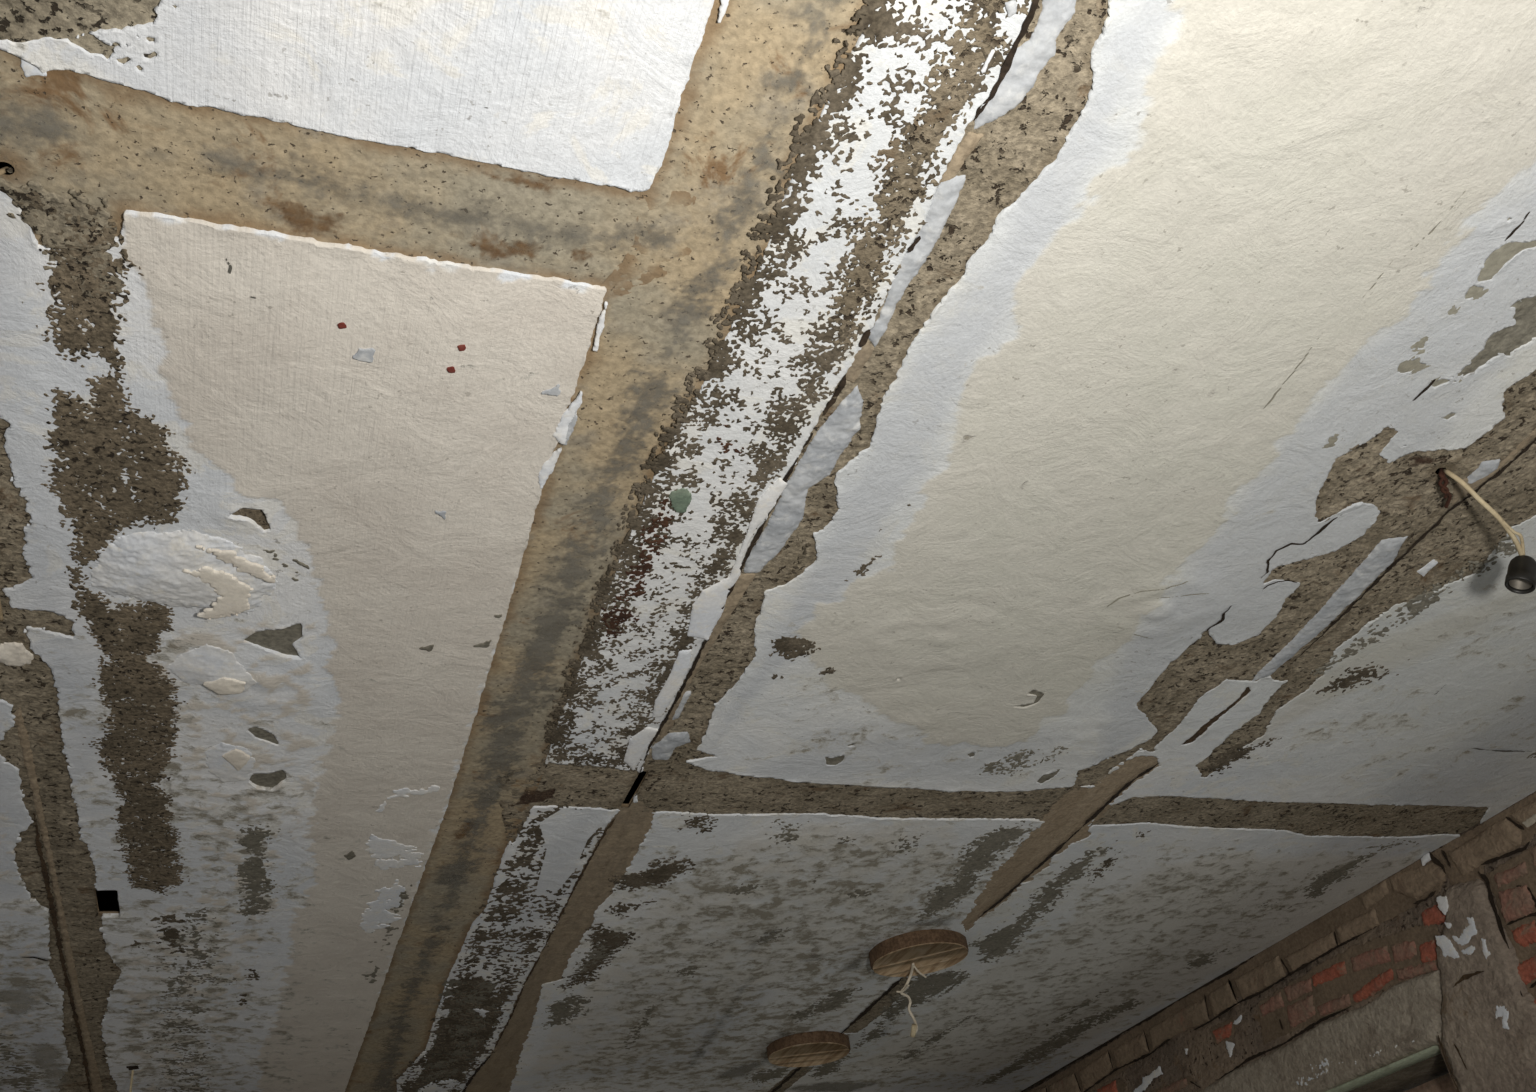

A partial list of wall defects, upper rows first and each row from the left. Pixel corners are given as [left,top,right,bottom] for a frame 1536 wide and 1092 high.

peeling [0,0,868,1092]
peeling [462,0,1536,1092]
damp [362,884,412,983]
damp [394,805,606,1092]
damp [542,855,696,1030]
damp [678,811,718,834]
damp [721,819,1150,1092]
damp [1201,738,1282,777]
crack [1413,817,1536,987]
crack [1437,1032,1467,1092]